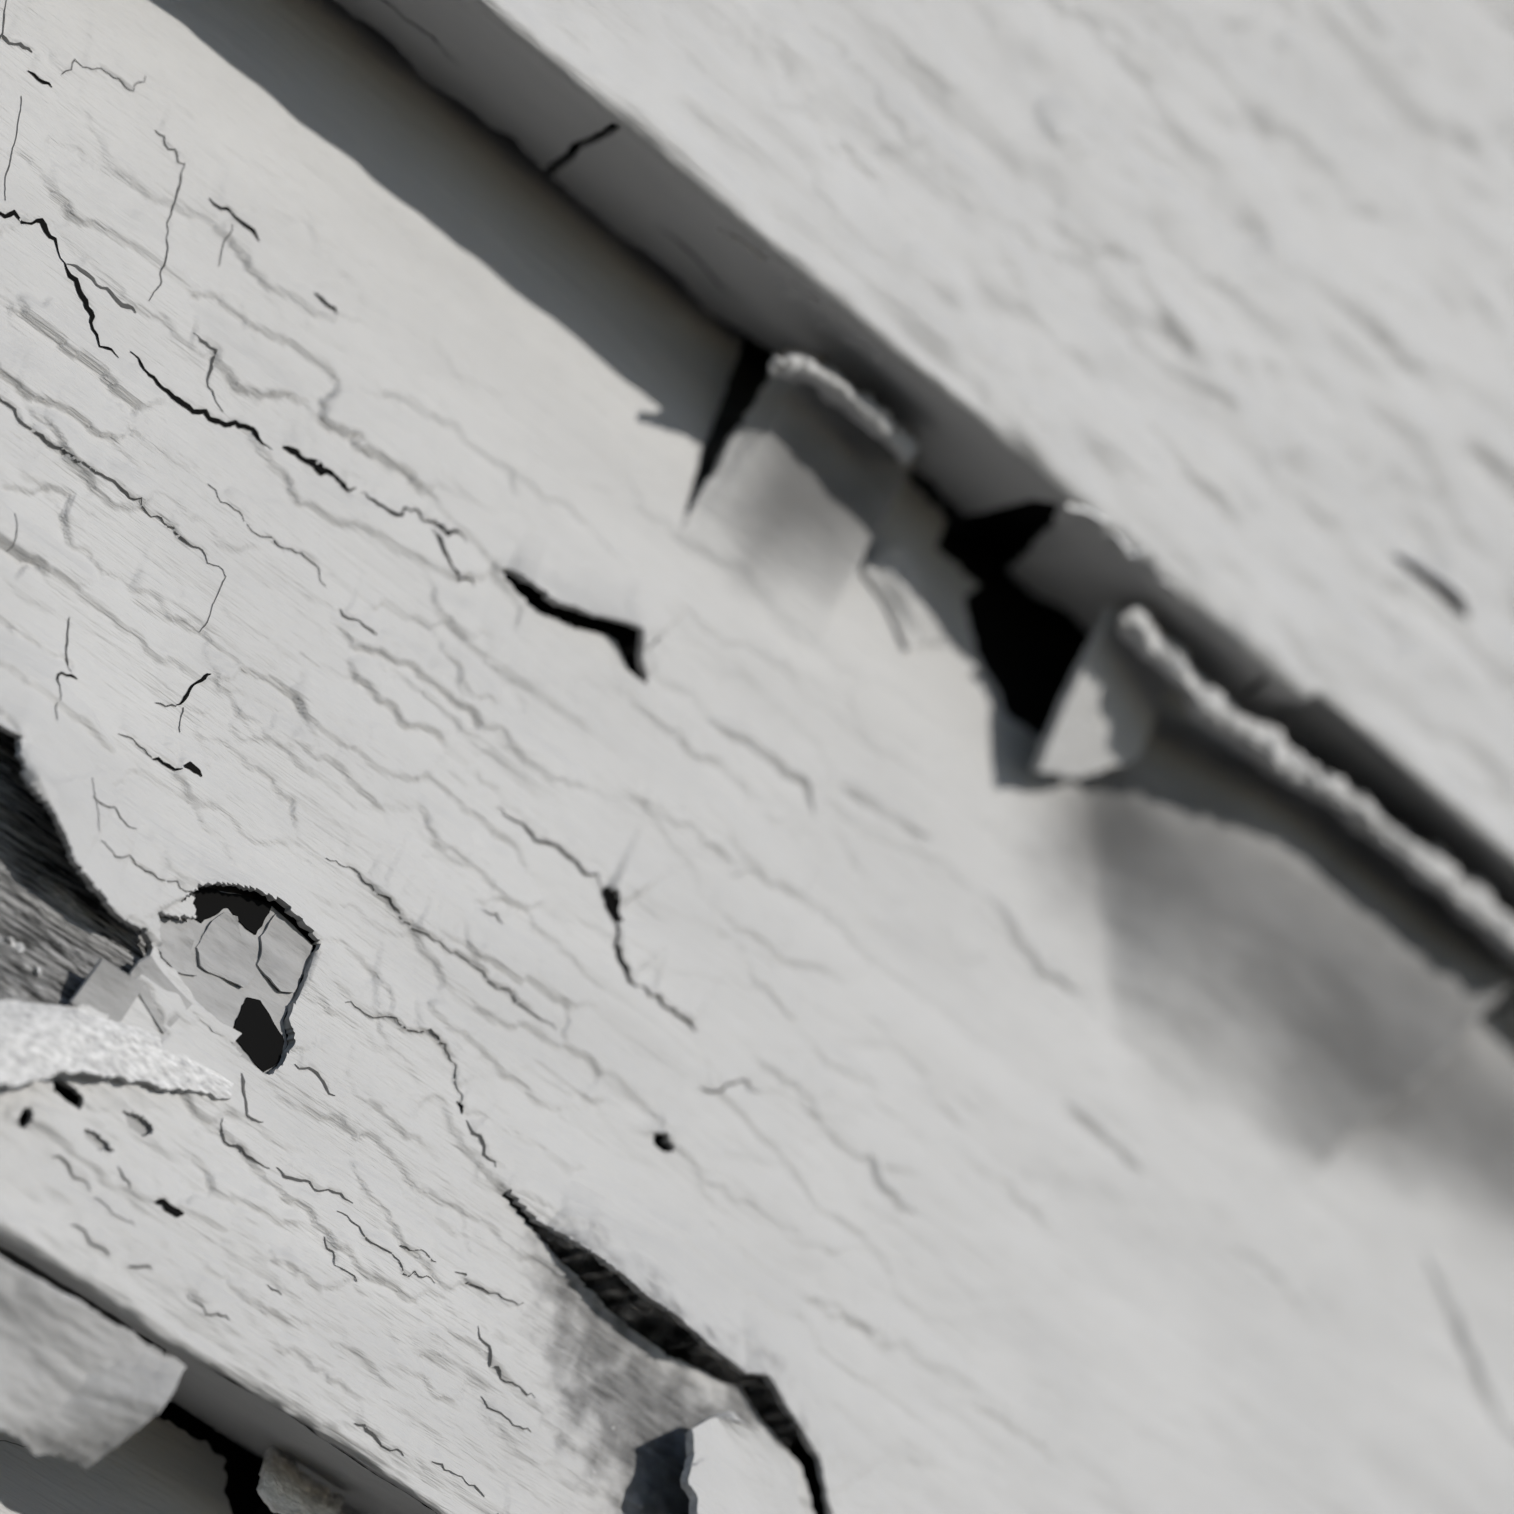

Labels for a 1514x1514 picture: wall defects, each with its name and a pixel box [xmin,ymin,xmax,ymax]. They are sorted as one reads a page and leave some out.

crack [0,0,640,679]
peeling [769,350,920,465]
peeling [863,545,947,651]
crack [118,673,211,777]
peeling [0,731,313,1105]
crack [326,858,556,1029]
crack [497,807,696,1032]
crack [346,1001,496,1167]
crack [52,1155,184,1269]
crack [155,1400,264,1514]
crack [201,1364,485,1514]
peeling [579,1309,804,1514]